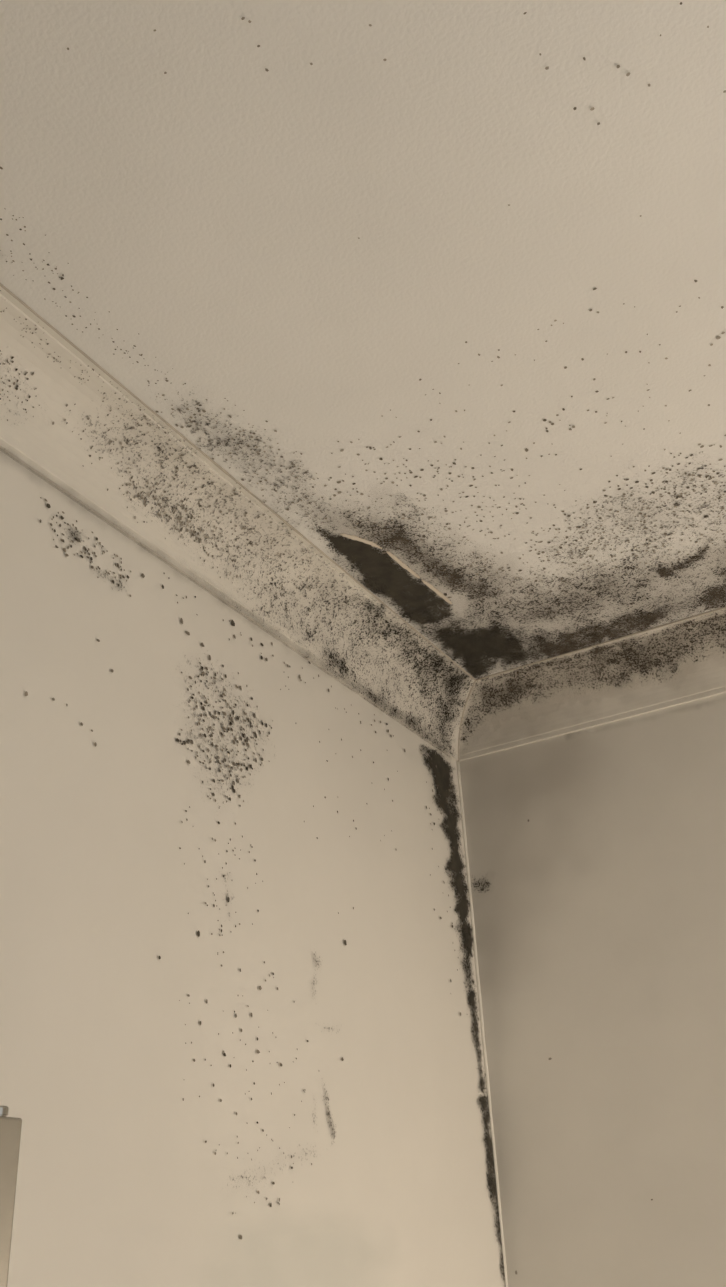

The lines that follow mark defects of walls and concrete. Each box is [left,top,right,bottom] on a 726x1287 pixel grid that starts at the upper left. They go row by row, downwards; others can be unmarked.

water stain [0,350,40,417]
water stain [0,208,173,386]
peeling [316,527,452,625]
water stain [14,317,726,1282]